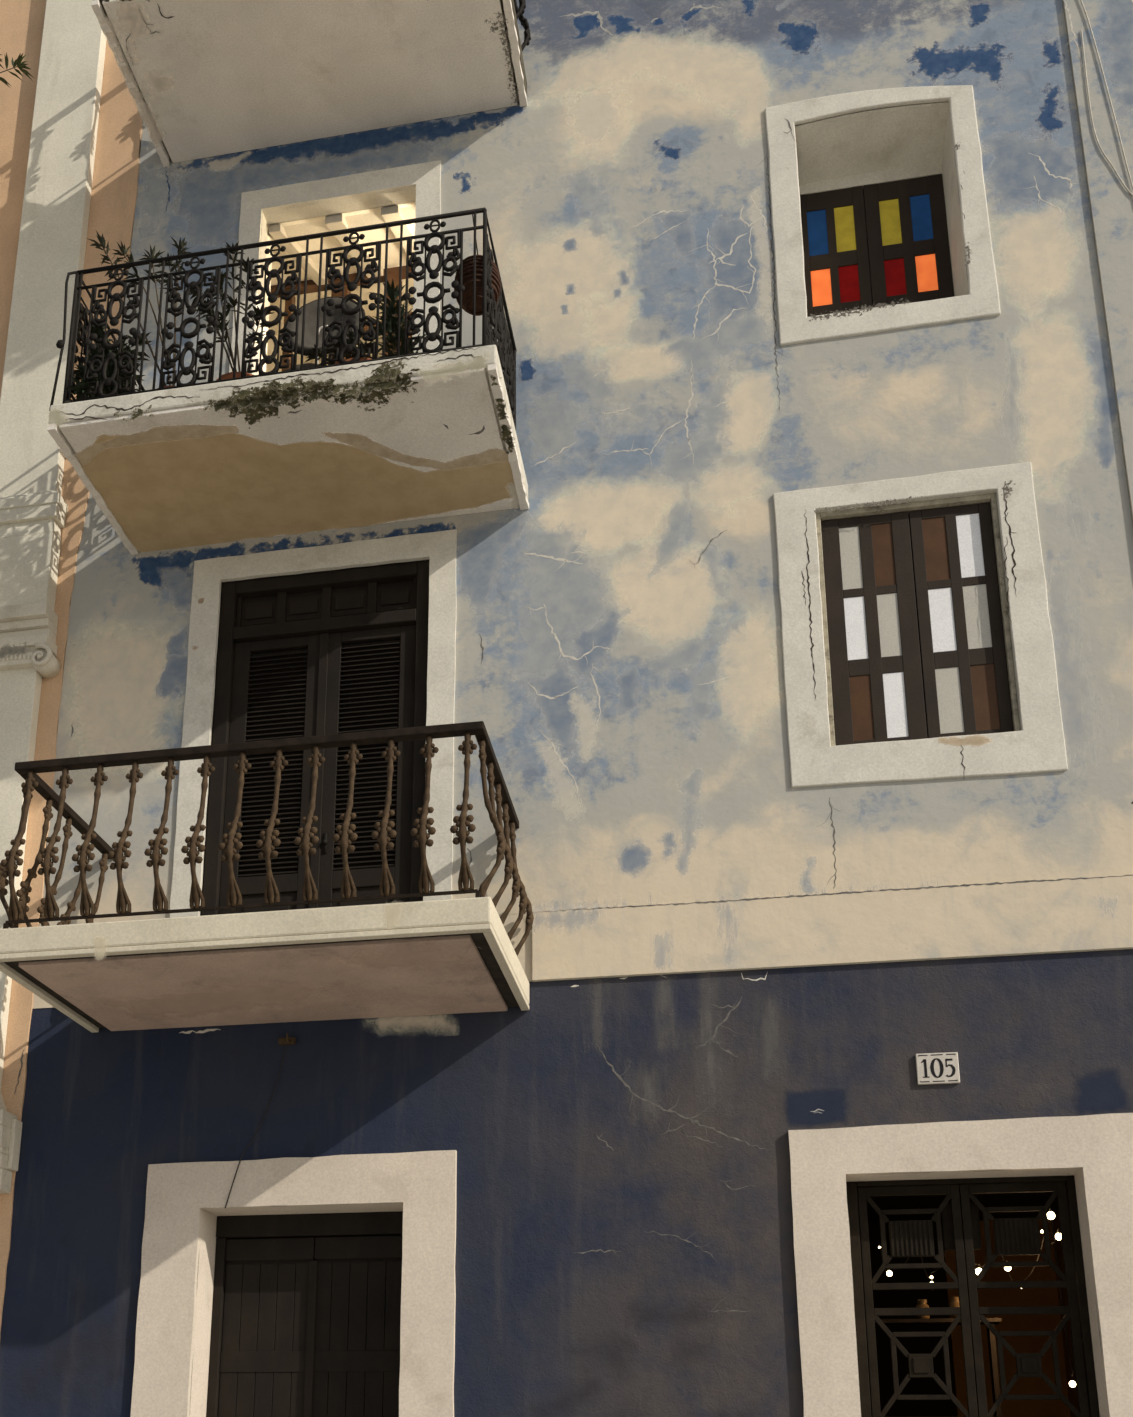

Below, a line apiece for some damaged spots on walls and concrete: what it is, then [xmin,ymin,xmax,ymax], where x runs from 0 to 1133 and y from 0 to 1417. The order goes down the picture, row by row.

peeling [549,5,769,136]
peeling [653,139,681,160]
peeling [907,3,1014,91]
crack [1063,0,1084,85]
crack [531,119,798,467]
peeling [656,191,773,482]
peeling [984,40,1117,496]
peeling [132,485,629,815]
crack [525,603,611,808]
crack [802,510,816,699]
crack [1003,481,1017,621]
crack [596,1044,769,1190]